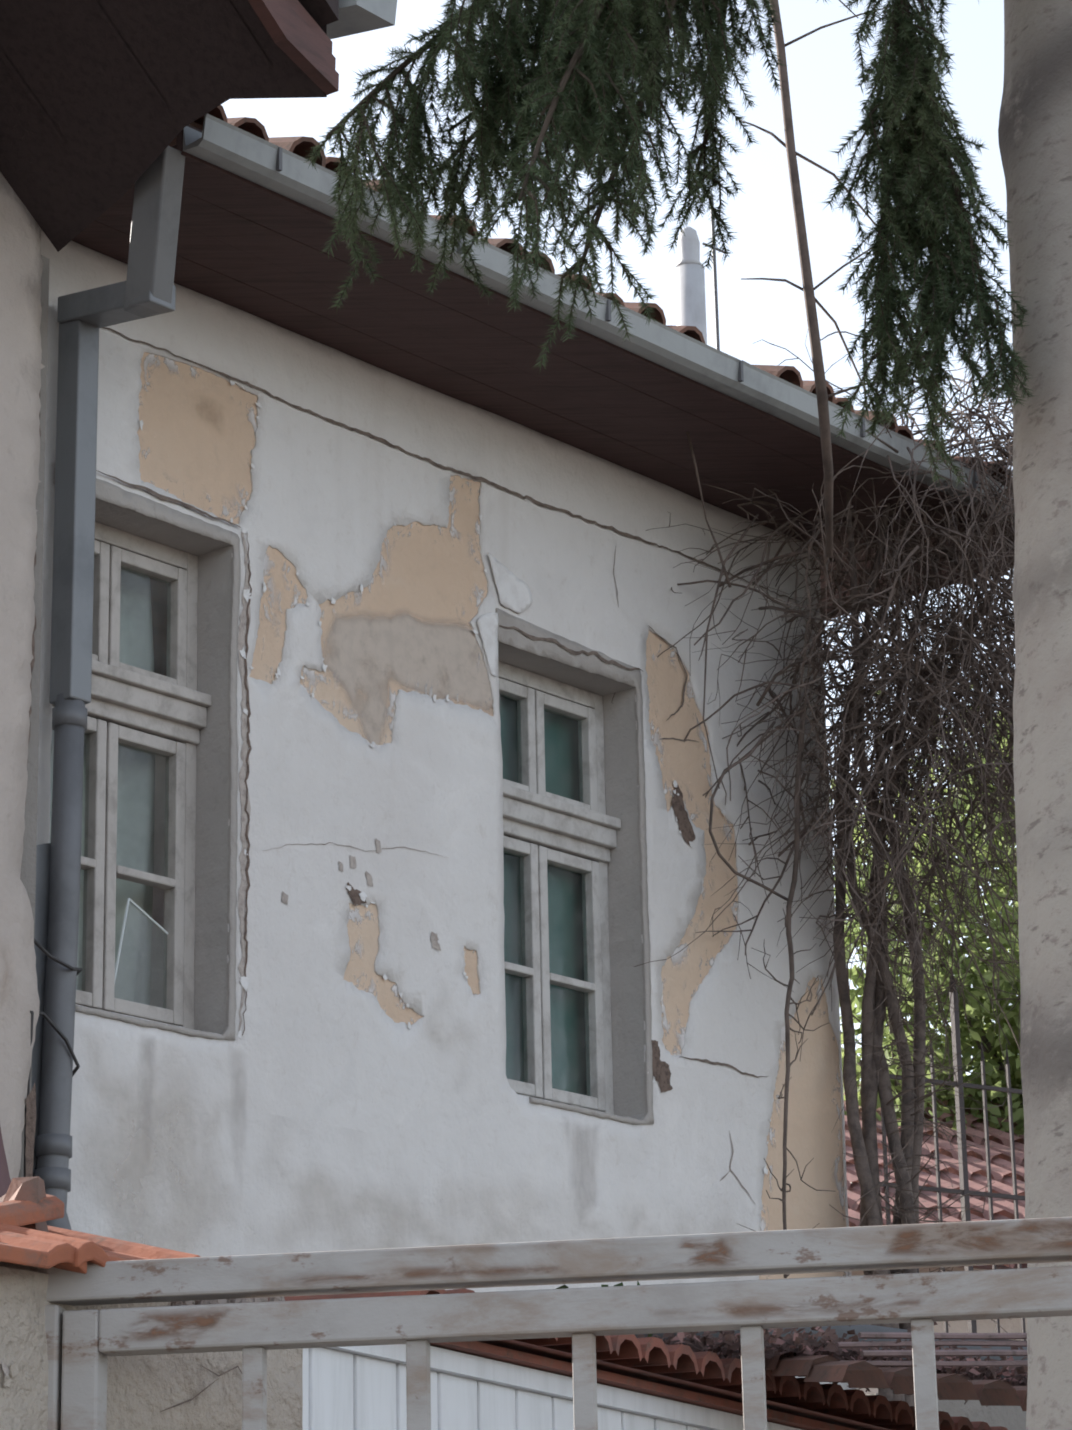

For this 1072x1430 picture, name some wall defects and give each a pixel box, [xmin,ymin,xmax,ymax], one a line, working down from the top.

crack [96,327,799,607]
flaking render [137,352,533,1040]
crack [499,625,643,671]
crack [649,626,698,742]
crack [262,842,441,856]
flaking render [646,630,741,1093]
crack [681,1056,768,1078]
flaking render [760,975,846,1231]
flaking render [759,1272,849,1280]